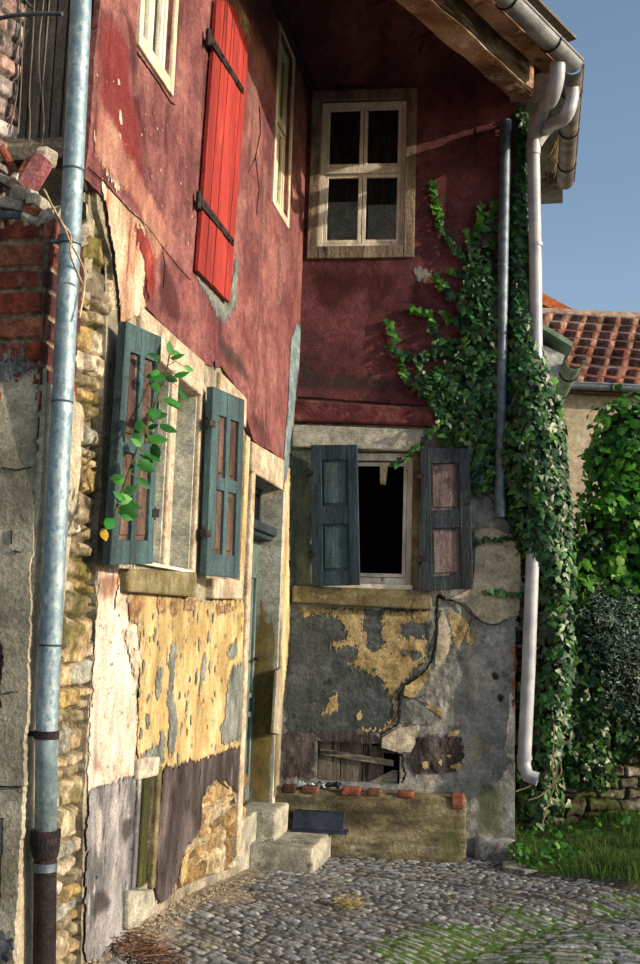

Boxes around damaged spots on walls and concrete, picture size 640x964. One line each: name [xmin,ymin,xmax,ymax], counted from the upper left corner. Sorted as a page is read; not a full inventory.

peeling [94,130,156,322]
peeling [281,324,432,782]
peeling [112,580,243,767]
peeling [407,730,465,777]
crack [379,594,508,783]
crack [0,818,8,902]
spalling [0,930,15,964]